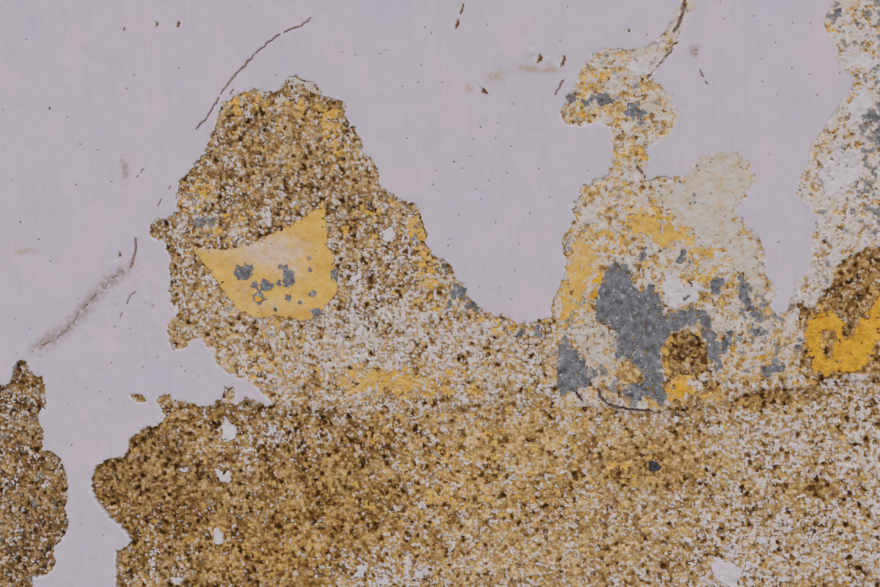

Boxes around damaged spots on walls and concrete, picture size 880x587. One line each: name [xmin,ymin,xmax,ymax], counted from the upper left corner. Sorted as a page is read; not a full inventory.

flaking render [150,0,880,416]
flaking render [0,360,69,587]
spalling [91,247,880,587]